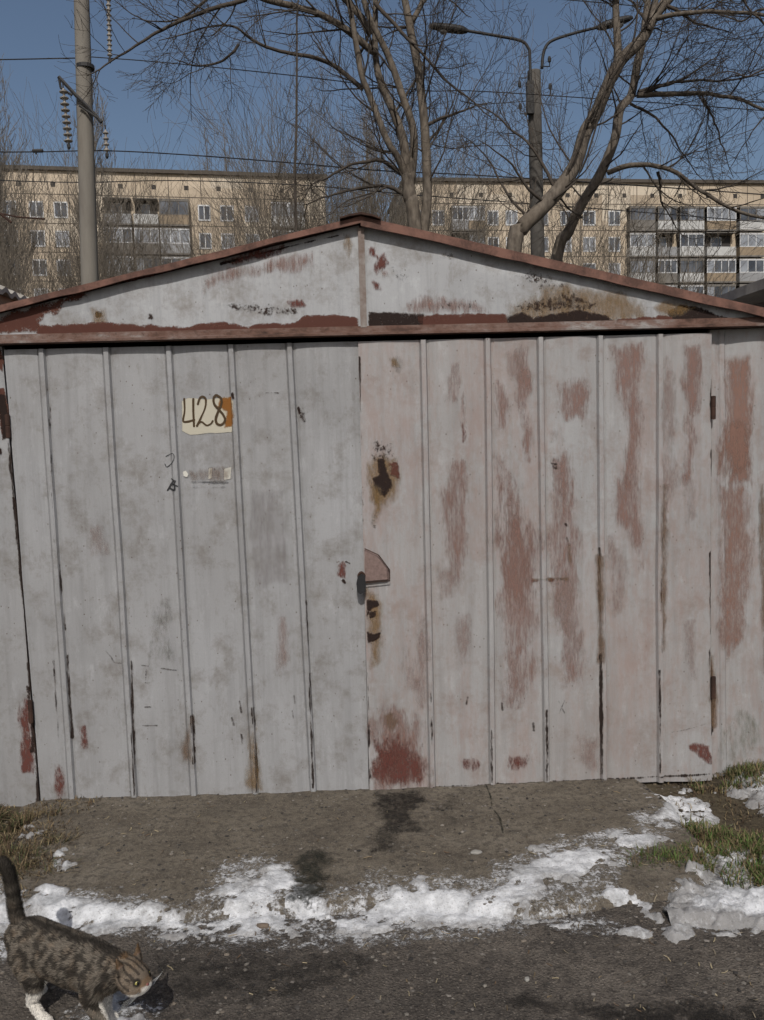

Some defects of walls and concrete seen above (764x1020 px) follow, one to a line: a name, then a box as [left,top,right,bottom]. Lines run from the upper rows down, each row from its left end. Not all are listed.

corrosion [0,273,727,334]
corrosion [0,388,31,692]
corrosion [369,441,400,512]
corrosion [532,632,707,781]